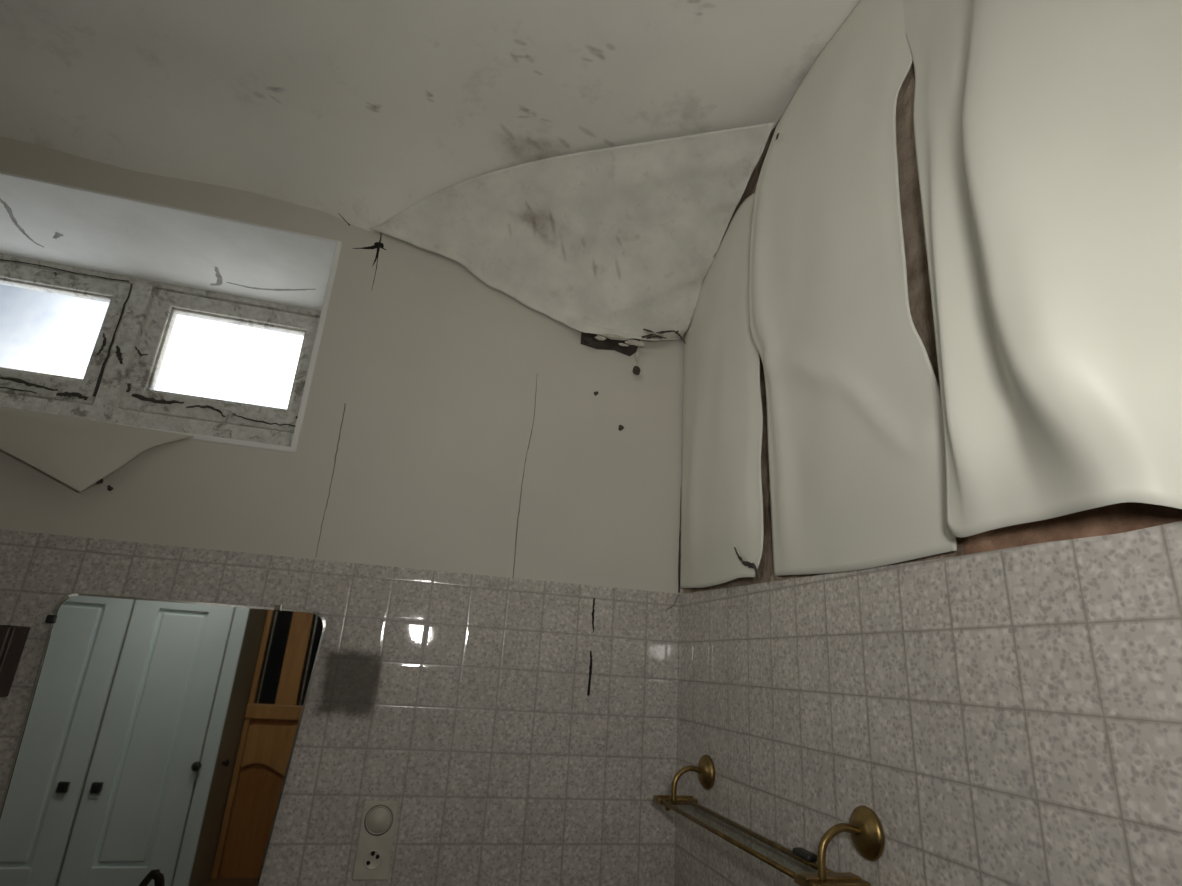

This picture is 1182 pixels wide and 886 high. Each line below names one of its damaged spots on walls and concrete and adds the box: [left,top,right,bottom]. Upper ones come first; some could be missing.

flaking render [905,70,929,273]
crack [0,198,64,247]
flaking render [961,502,1182,555]
crack [587,598,595,696]